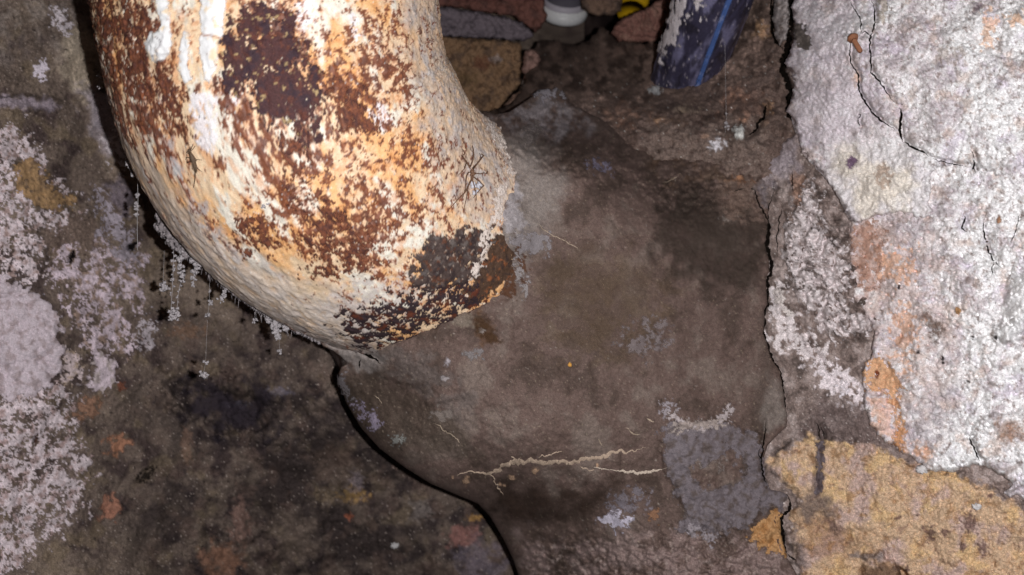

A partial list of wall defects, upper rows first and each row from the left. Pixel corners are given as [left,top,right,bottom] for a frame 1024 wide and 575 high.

rust [87,0,197,145]
rust [216,0,386,280]
crack [747,0,794,136]
crack [849,2,976,173]
efflorescence [0,122,159,575]
rust [324,224,531,353]
efflorescence [658,398,735,436]
crack [735,171,797,562]